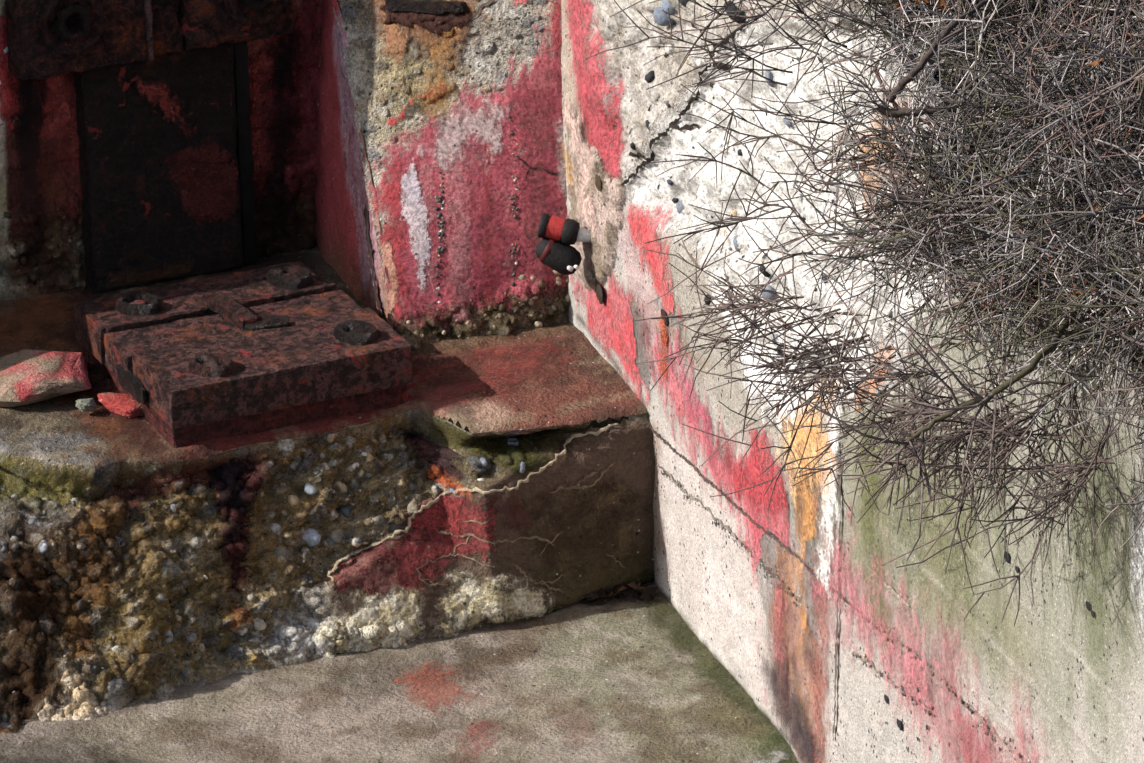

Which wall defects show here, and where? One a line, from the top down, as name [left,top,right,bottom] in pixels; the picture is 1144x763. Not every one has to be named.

corrosion [370,0,467,115]
crack [621,19,749,187]
crack [0,466,64,495]
crack [327,416,882,741]
leakage [762,655,819,763]